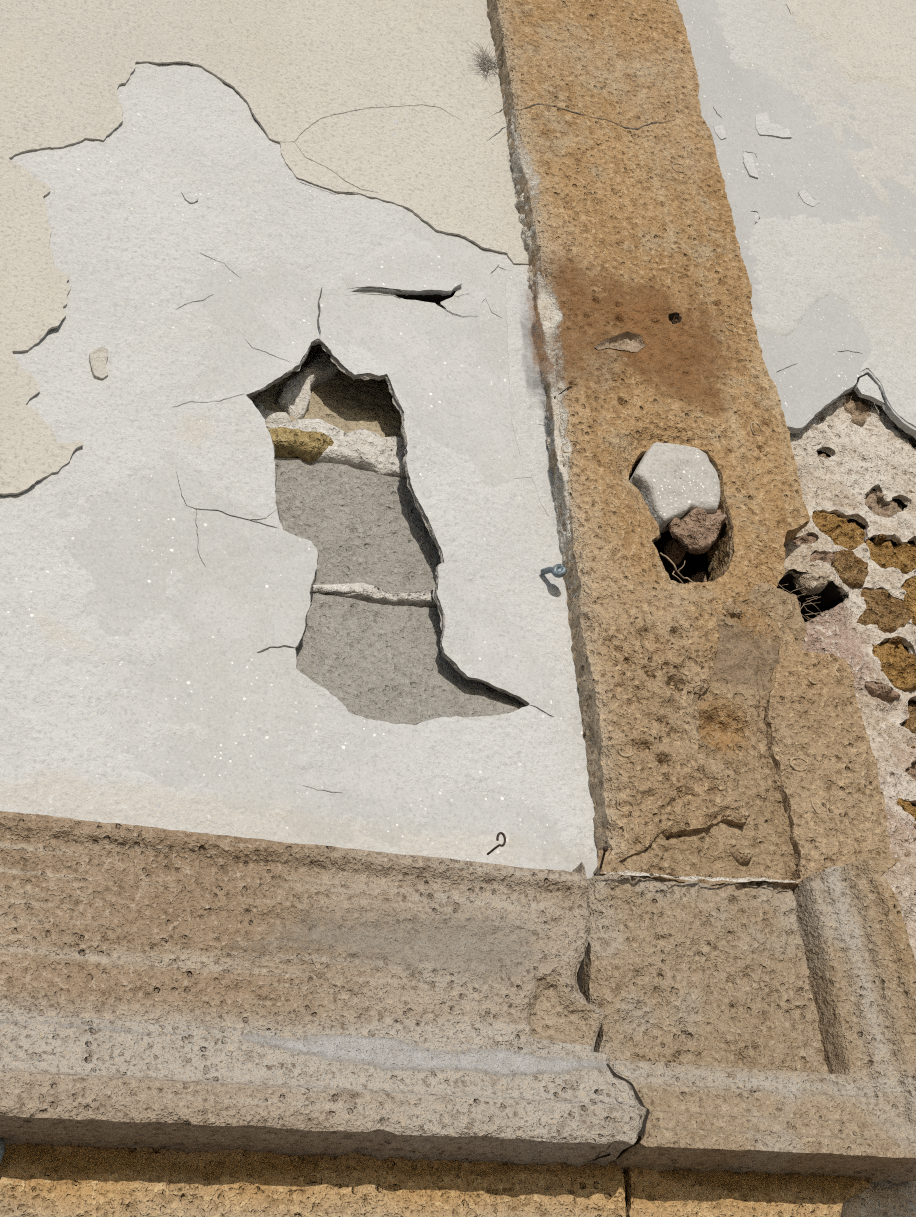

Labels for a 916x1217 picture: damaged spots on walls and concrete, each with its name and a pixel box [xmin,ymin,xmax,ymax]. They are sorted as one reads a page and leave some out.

crack [275,104,459,193]
peeling [714,0,916,204]
crack [176,472,277,567]
peeling [0,63,916,963]
crack [576,957,584,993]
crack [593,1037,650,1136]
crack [592,1154,627,1211]
spalling [841,1181,916,1217]